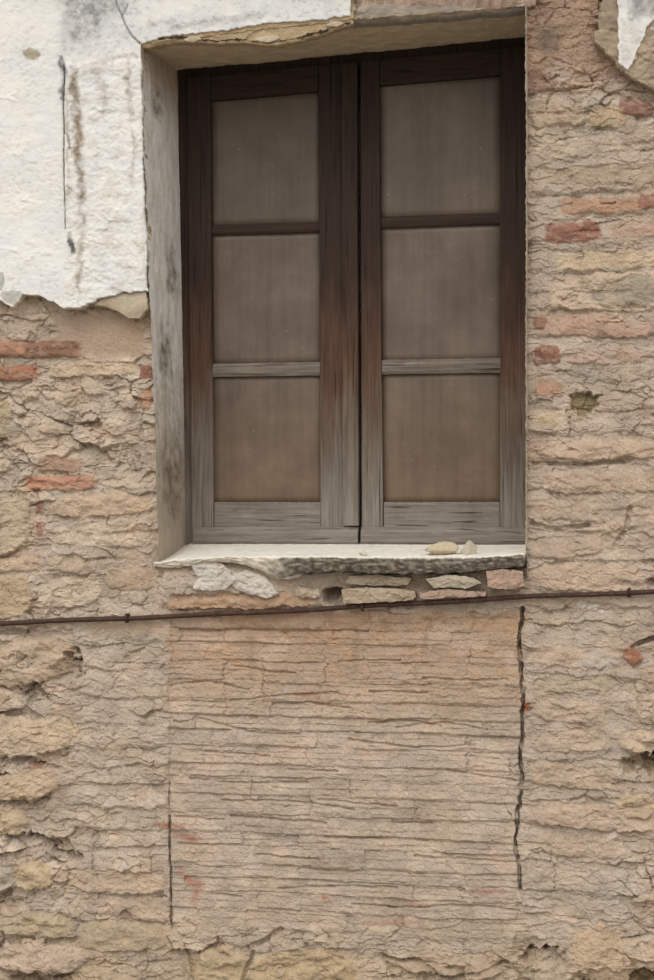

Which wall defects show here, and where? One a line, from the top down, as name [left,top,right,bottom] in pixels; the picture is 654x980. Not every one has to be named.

crack [116,2,350,44]
spalling [141,0,539,51]
peeling [23,48,40,59]
peeling [617,20,654,93]
leakage [58,56,84,198]
spalling [173,562,320,598]
spalling [342,569,524,604]
crack [505,605,533,888]